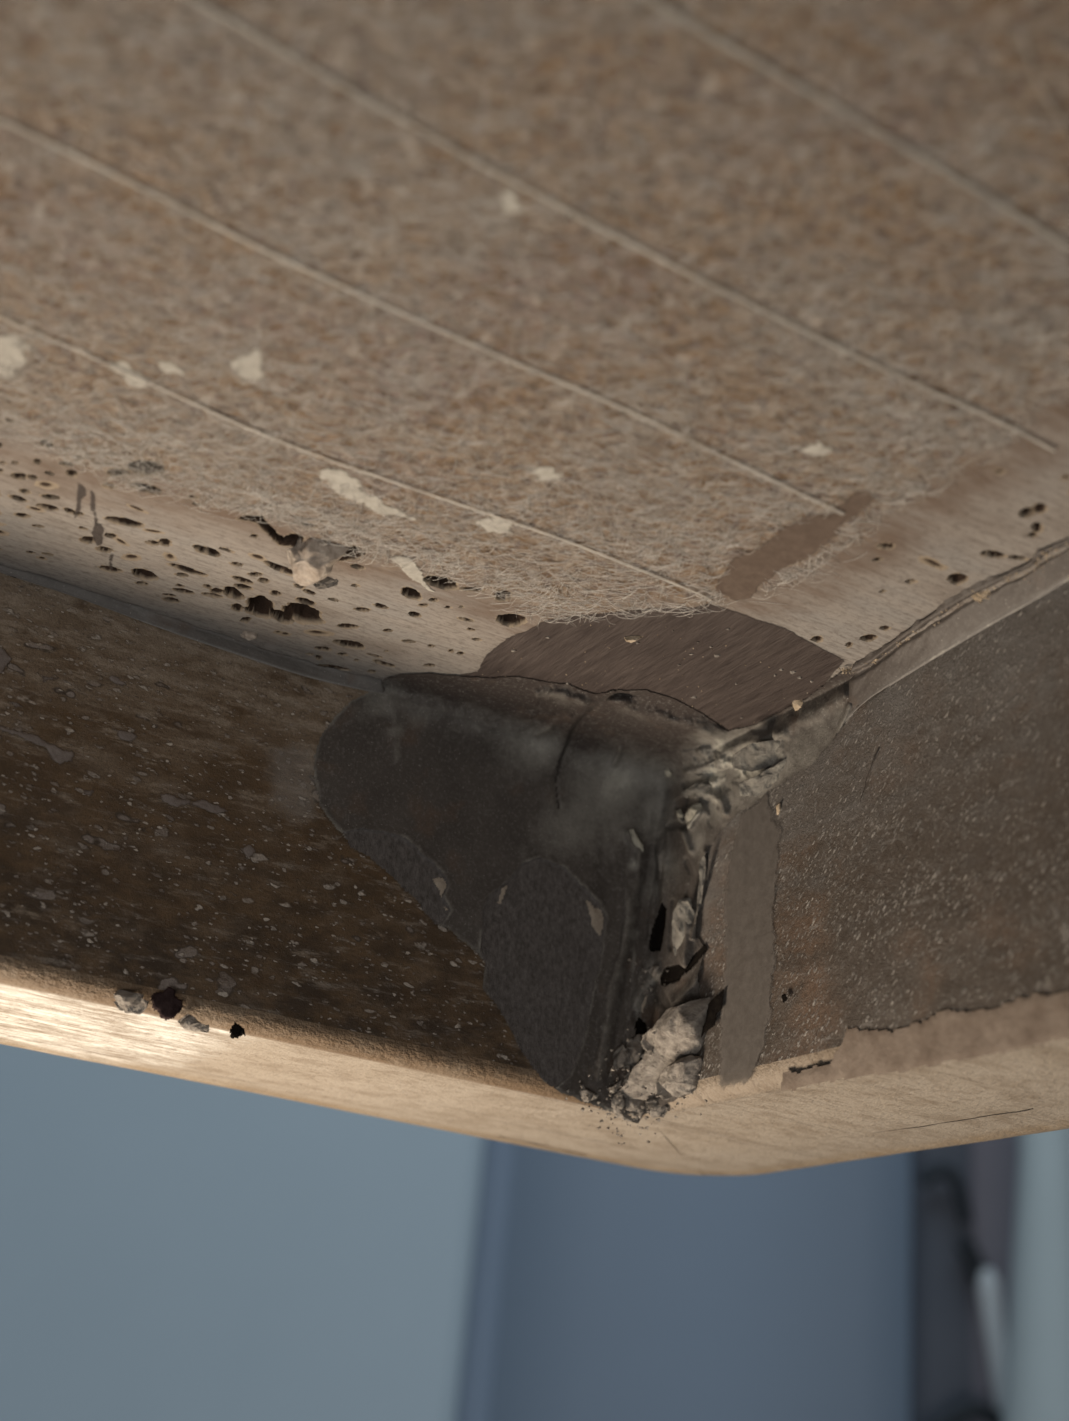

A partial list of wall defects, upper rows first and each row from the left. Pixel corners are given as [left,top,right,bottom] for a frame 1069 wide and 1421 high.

spalling [0,439,528,673]
water stain [460,490,873,731]
spalling [113,987,210,1033]
spalling [229,1022,246,1039]